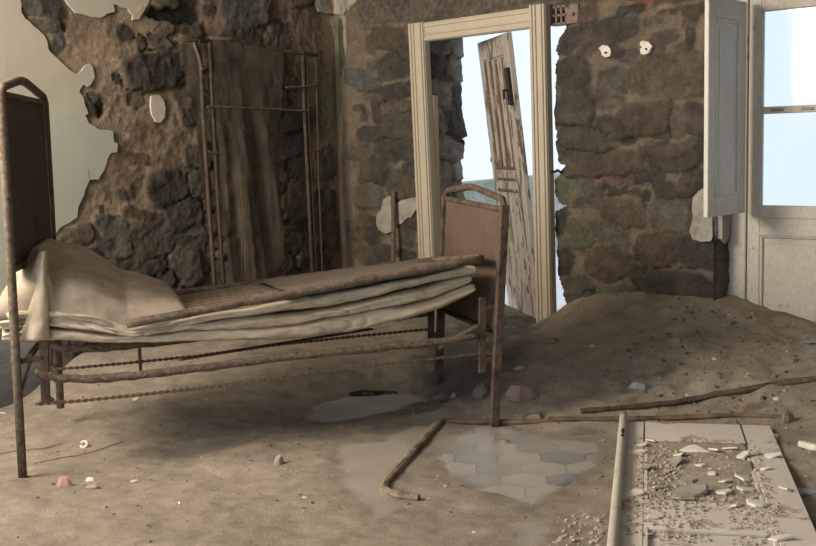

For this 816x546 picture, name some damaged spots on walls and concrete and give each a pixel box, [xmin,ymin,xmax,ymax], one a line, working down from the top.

flaking render [20,0,349,290]
flaking render [52,340,109,367]